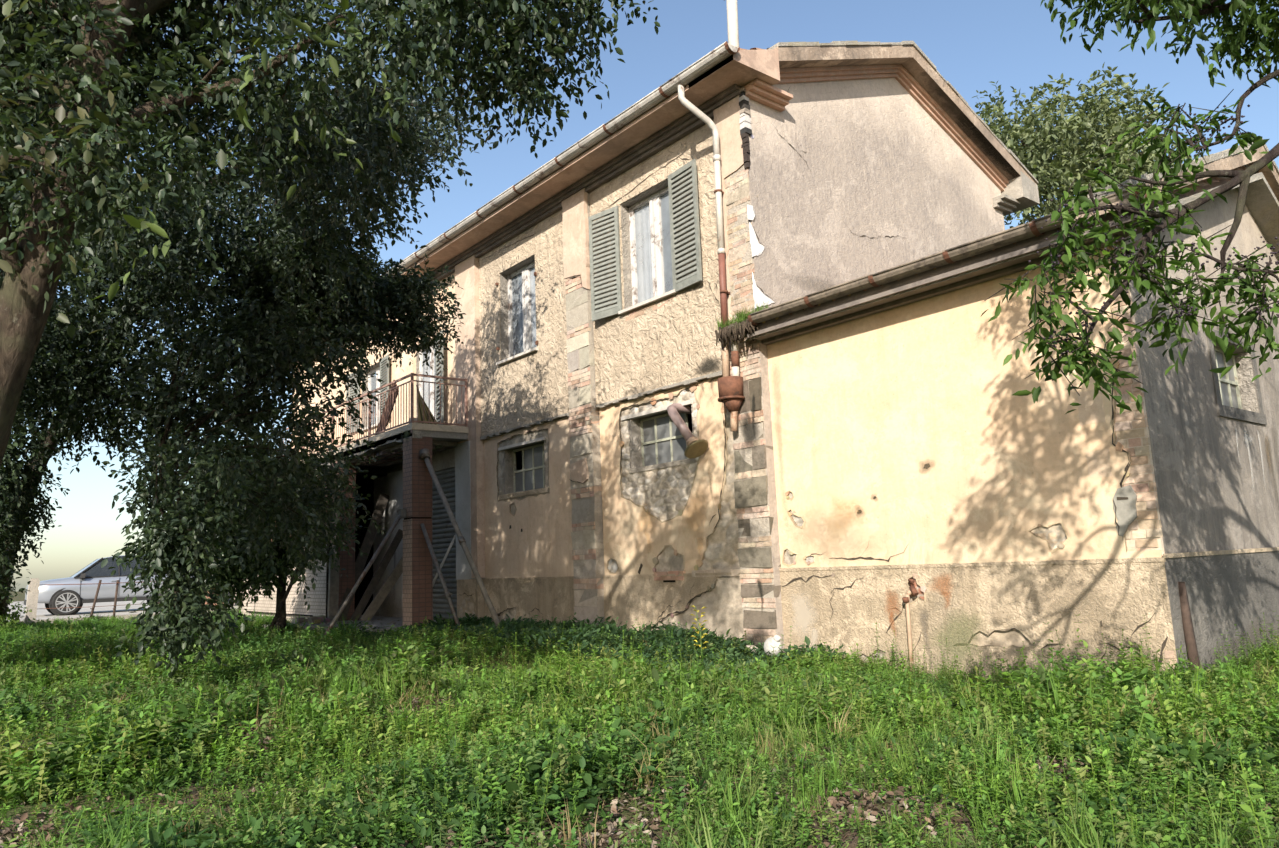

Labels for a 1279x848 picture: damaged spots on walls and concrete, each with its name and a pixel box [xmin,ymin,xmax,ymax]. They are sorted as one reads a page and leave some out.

flaking render [747,204,764,257]
flaking render [752,272,775,309]
flaking render [1105,304,1132,486]
flaking render [618,384,701,523]
crack [707,403,726,537]
flaking render [627,405,744,641]
spalling [1028,521,1071,554]
crack [637,580,716,632]
crack [780,543,908,617]